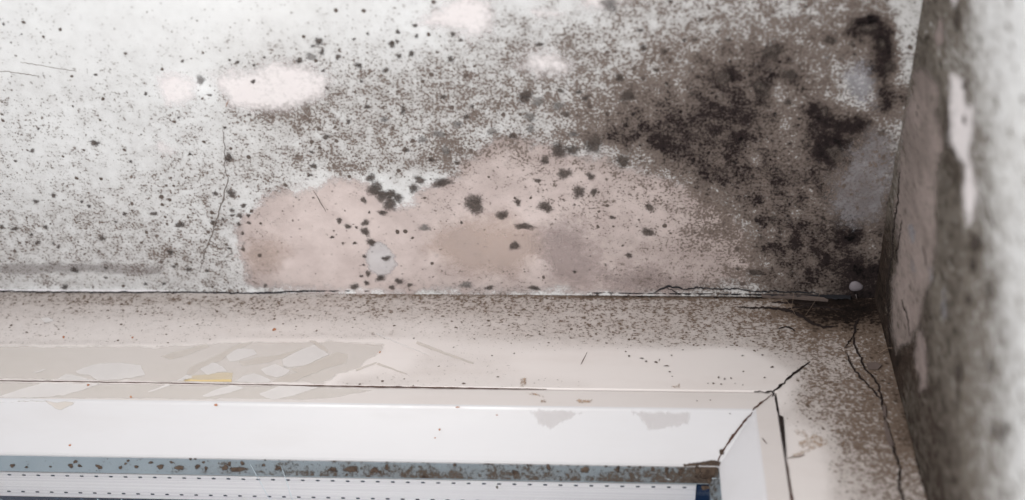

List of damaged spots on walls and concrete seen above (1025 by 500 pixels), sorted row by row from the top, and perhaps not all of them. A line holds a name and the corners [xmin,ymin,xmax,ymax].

water stain [0,89,103,171]
water stain [64,60,140,139]
crack [0,130,369,294]
water stain [330,211,375,246]
water stain [458,189,487,213]
water stain [496,211,532,230]
crack [588,173,927,500]